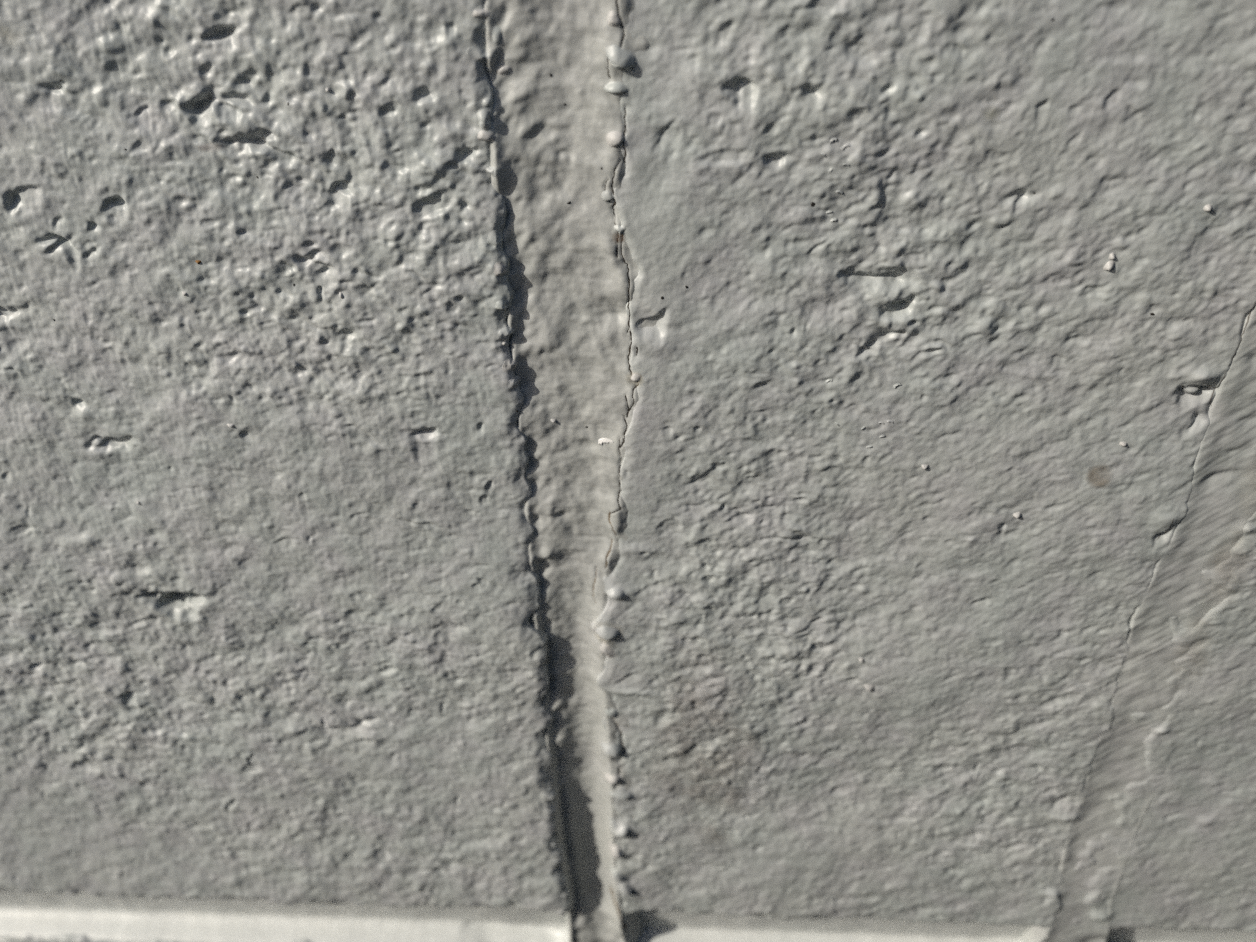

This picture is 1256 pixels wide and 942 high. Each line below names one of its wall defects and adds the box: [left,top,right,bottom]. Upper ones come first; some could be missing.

crack [607,0,625,78]
crack [592,107,639,604]